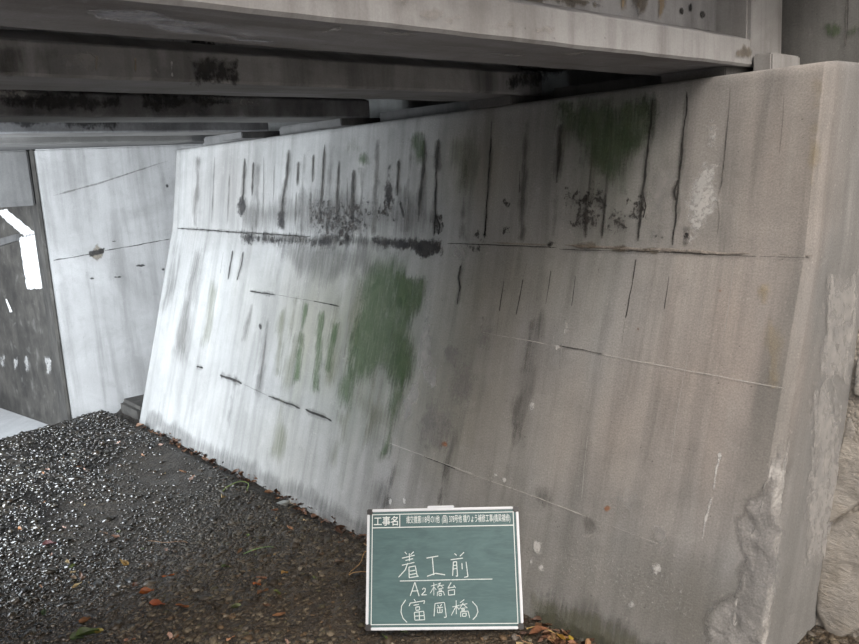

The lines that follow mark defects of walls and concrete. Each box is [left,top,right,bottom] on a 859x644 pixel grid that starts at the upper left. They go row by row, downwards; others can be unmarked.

damp [0,91,119,111]
damp [142,93,228,112]
damp [194,57,239,85]
crack [54,228,310,295]
damp [243,152,404,246]
damp [373,238,440,258]
damp [413,136,439,215]
damp [565,187,643,248]
crack [434,94,806,318]
spalling [704,451,788,644]